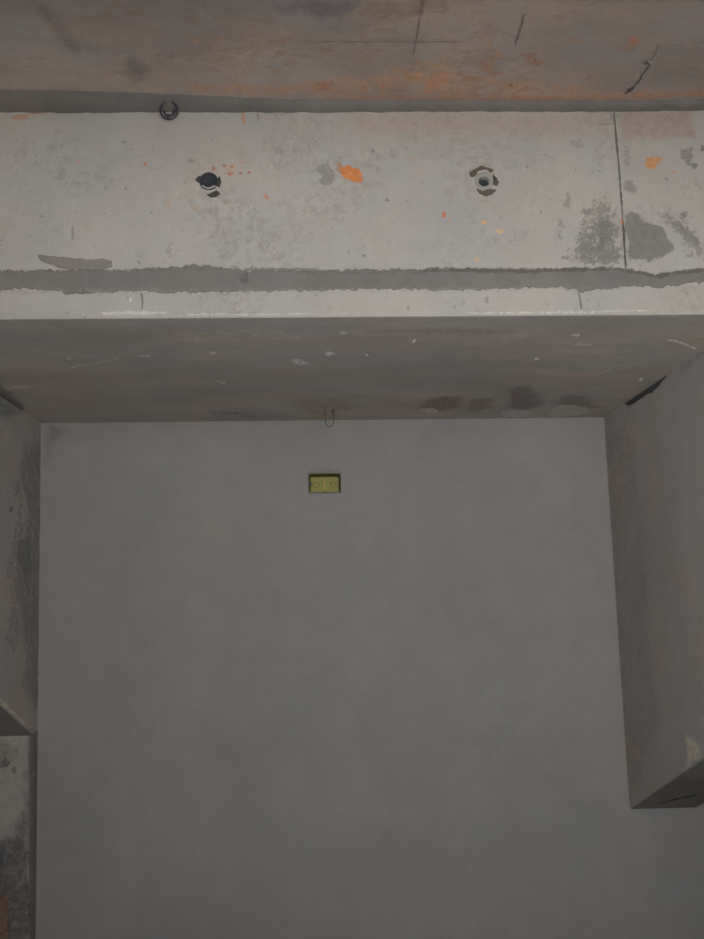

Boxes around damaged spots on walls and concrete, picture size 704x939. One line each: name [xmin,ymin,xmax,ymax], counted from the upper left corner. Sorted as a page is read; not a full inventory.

corrosion [337,164,362,182]
crack [591,45,659,266]